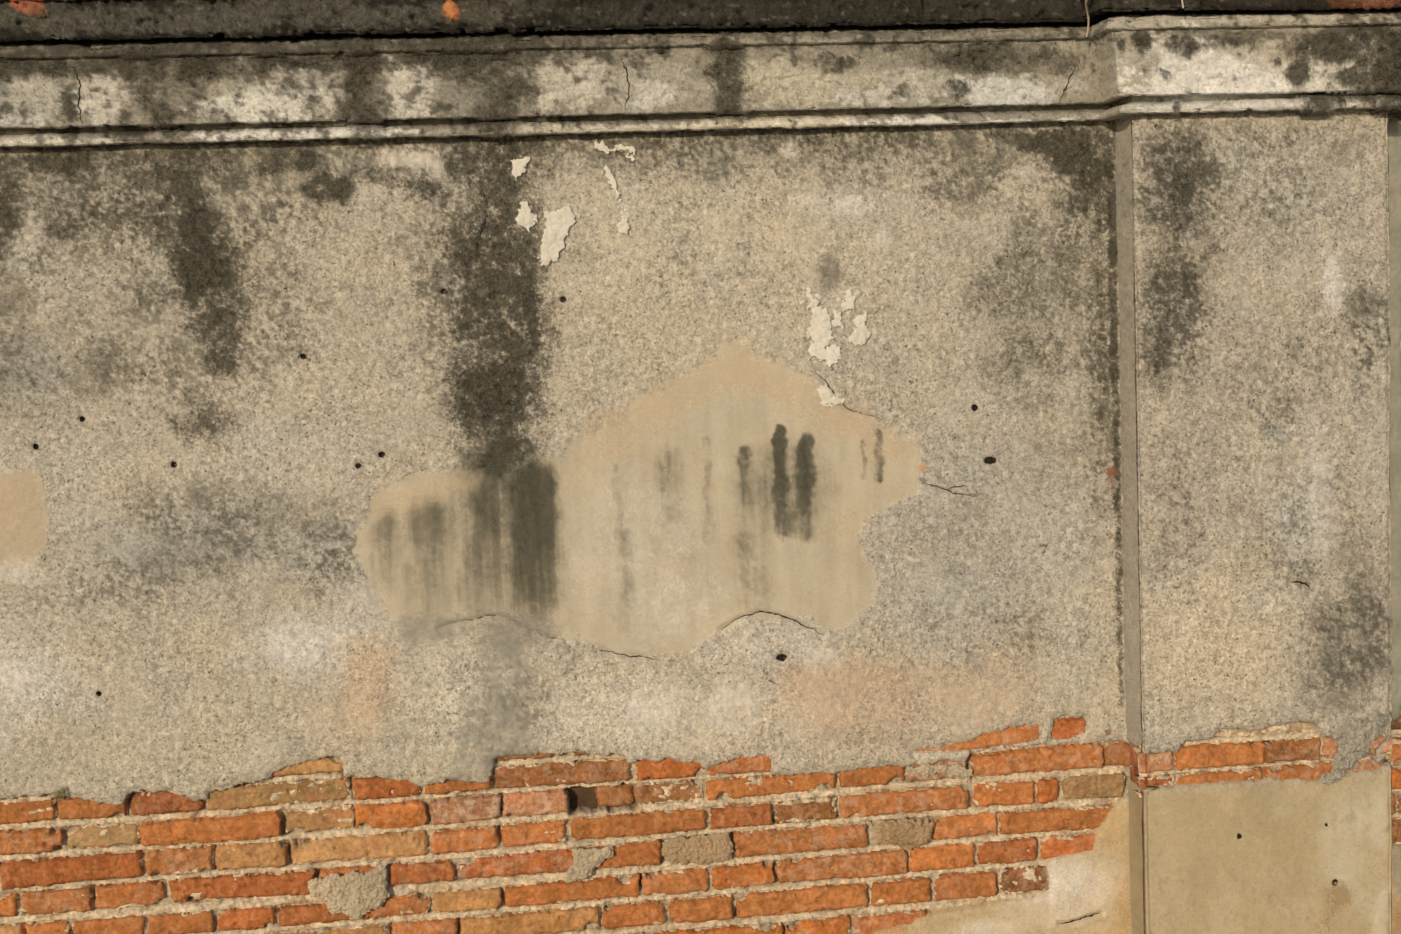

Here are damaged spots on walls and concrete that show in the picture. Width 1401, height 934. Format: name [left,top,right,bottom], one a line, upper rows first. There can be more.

water stain [613,48,668,77]
water stain [1107,29,1261,82]
peeling [510,156,530,178]
peeling [515,199,575,266]
peeling [594,139,636,234]
water stain [0,32,562,783]
water stain [952,97,1222,706]
flaking render [351,285,927,660]
water stain [737,424,817,540]
water stain [861,429,885,483]
flaking render [0,715,1401,934]